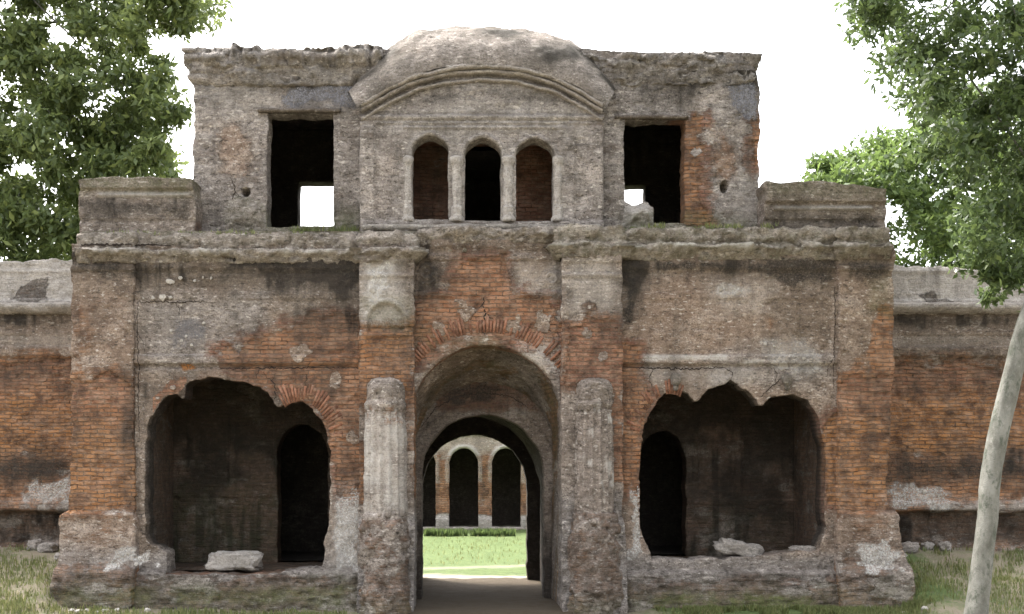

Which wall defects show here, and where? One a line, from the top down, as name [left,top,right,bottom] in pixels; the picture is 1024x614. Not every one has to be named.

flaking render [684,112,710,226]
flaking render [0,357,135,514]
flaking render [213,253,653,500]
crack [628,367,733,386]
flaking render [822,358,1004,508]
flaking render [1007,373,1024,451]